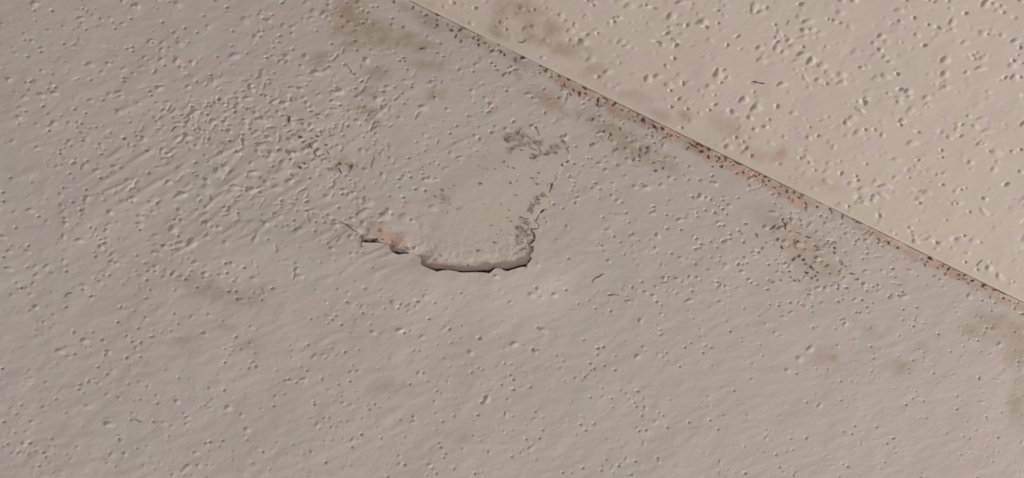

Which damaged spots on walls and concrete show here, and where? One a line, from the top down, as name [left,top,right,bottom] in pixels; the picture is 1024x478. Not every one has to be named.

peeling [334,147,573,289]
crack [434,124,566,254]